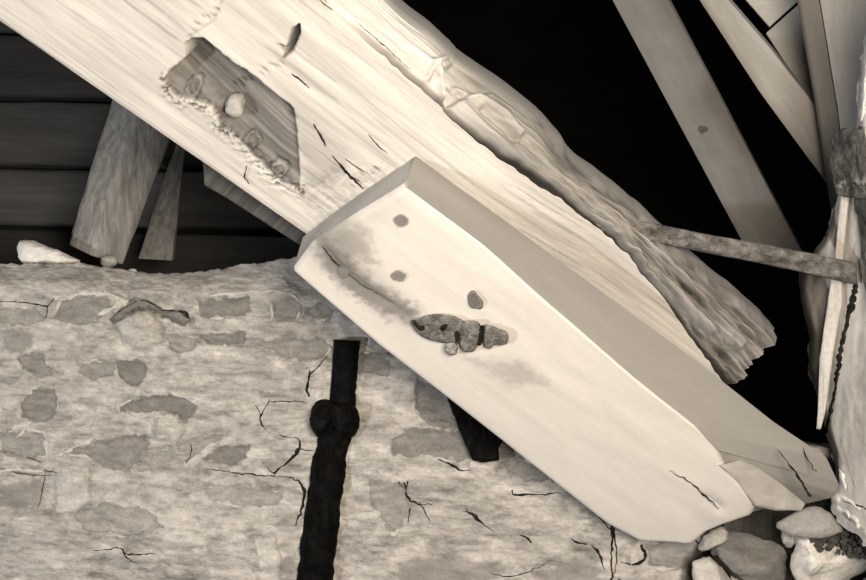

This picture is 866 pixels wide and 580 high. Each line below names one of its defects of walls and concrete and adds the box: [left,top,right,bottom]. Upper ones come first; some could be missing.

crack [313,124,364,190]
spalling [0,308,43,328]
spalling [55,295,249,353]
crack [824,283,858,434]
crack [211,356,327,526]
crack [1,457,58,508]
crack [398,481,432,524]
crack [463,508,494,532]
crack [669,470,719,509]
crack [778,448,817,497]
crack [93,547,153,563]
crack [571,517,647,580]